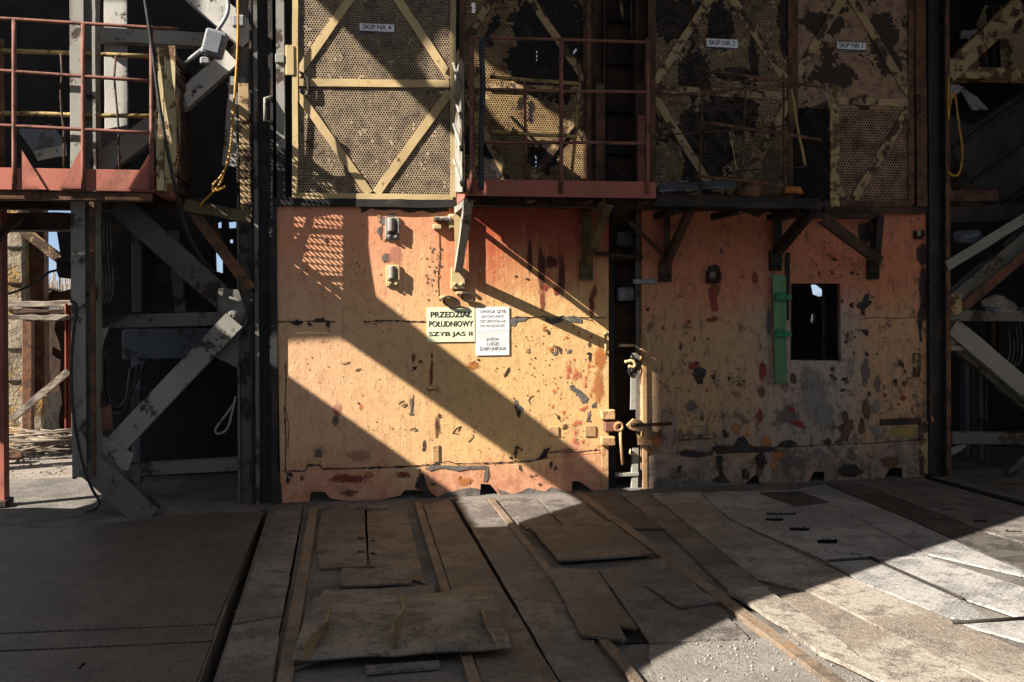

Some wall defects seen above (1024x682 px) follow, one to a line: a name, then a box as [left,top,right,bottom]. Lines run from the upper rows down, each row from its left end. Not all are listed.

rust [706,264,720,322]
peeling [841,293,875,316]
peeling [515,315,601,444]
peeling [678,320,746,392]
peeling [823,359,920,445]
peeling [415,465,489,497]
peeling [497,446,565,495]
peeling [678,403,797,483]